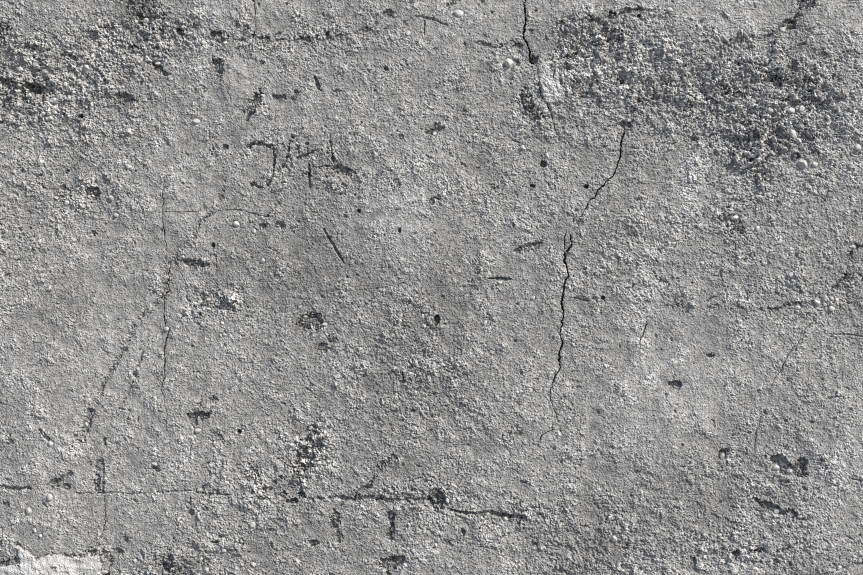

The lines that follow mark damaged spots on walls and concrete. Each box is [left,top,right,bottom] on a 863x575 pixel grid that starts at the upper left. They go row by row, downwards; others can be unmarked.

crack [520,0,563,148]
crack [143,174,192,432]
crack [537,128,626,448]